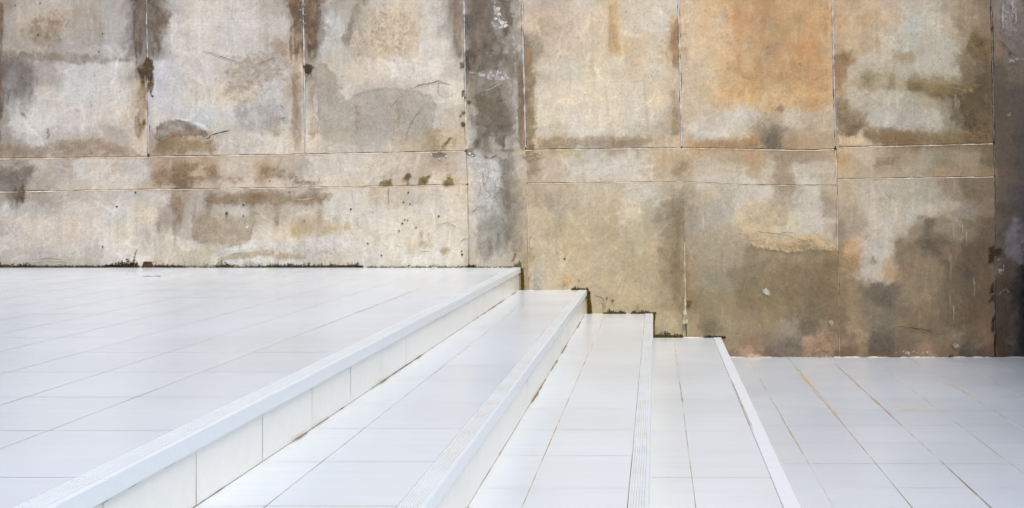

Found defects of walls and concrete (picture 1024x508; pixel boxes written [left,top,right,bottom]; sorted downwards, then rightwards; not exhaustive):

water stain [137,114,215,212]
water stain [450,0,652,268]